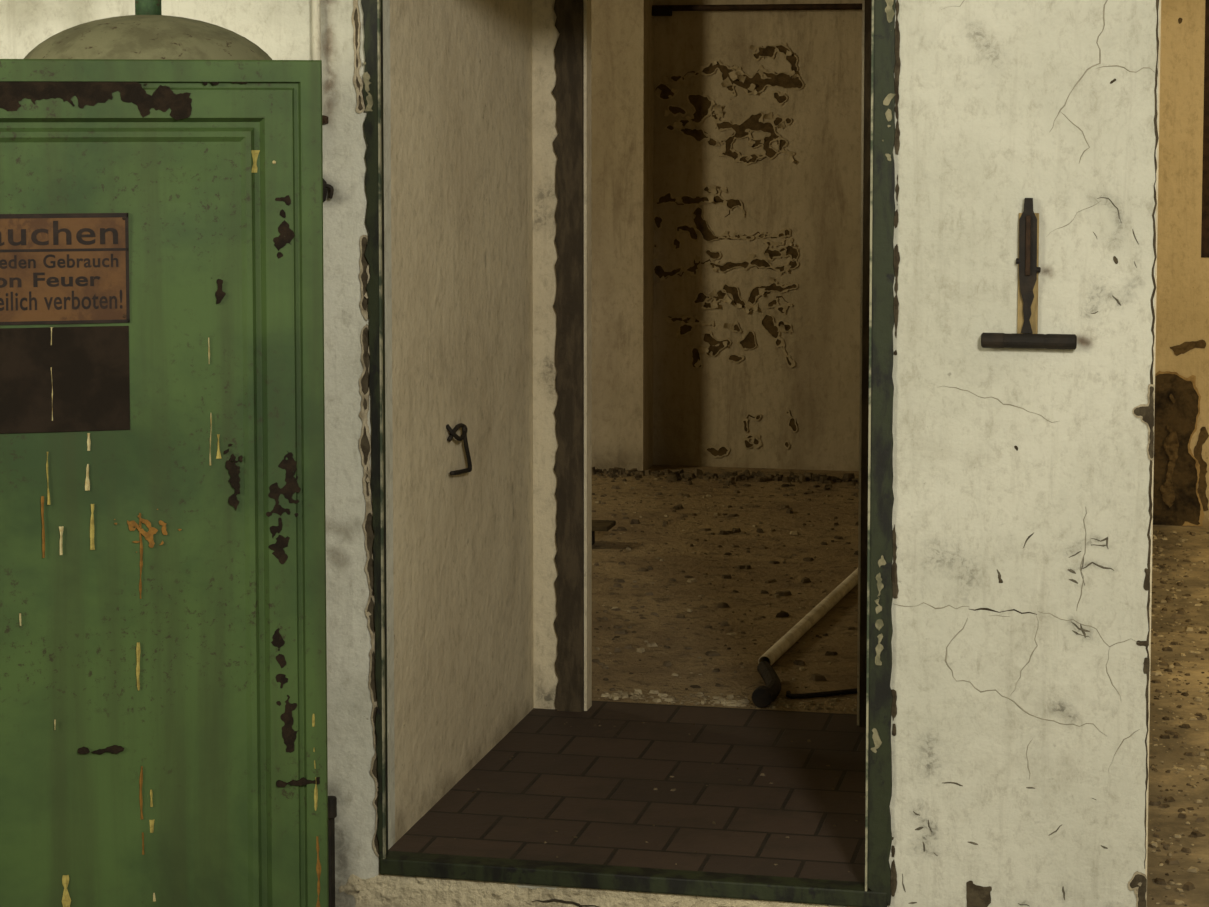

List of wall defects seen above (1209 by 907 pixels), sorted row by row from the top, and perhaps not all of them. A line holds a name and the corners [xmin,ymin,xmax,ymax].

peeling [654,43,805,165]
flaking render [882,0,901,161]
crack [1050,0,1154,163]
peeling [653,184,799,368]
crack [940,386,1058,423]
flaking render [1132,371,1209,526]
flaking render [1170,340,1206,356]
flaking render [875,524,899,665]
crack [895,507,1140,778]
flaking render [871,689,897,753]
crack [532,899,599,907]
flaking render [966,881,992,907]